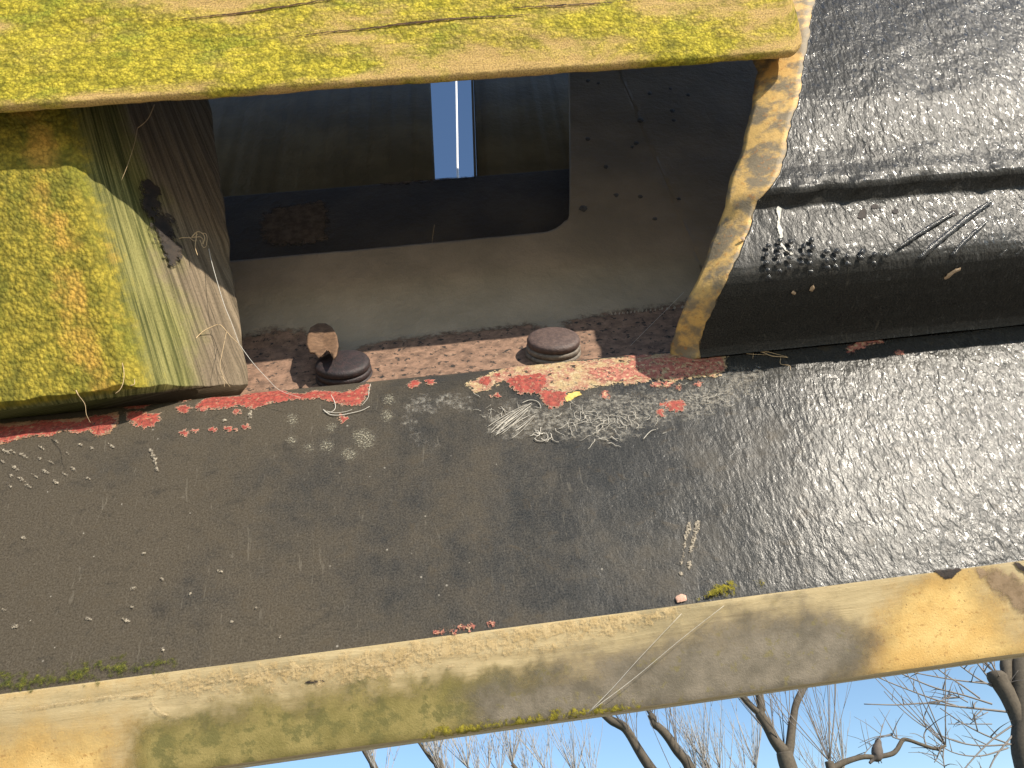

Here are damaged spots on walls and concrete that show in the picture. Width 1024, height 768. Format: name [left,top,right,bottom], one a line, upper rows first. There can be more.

peeling [176,383,371,437]
peeling [464,353,727,417]
water stain [132,608,875,768]